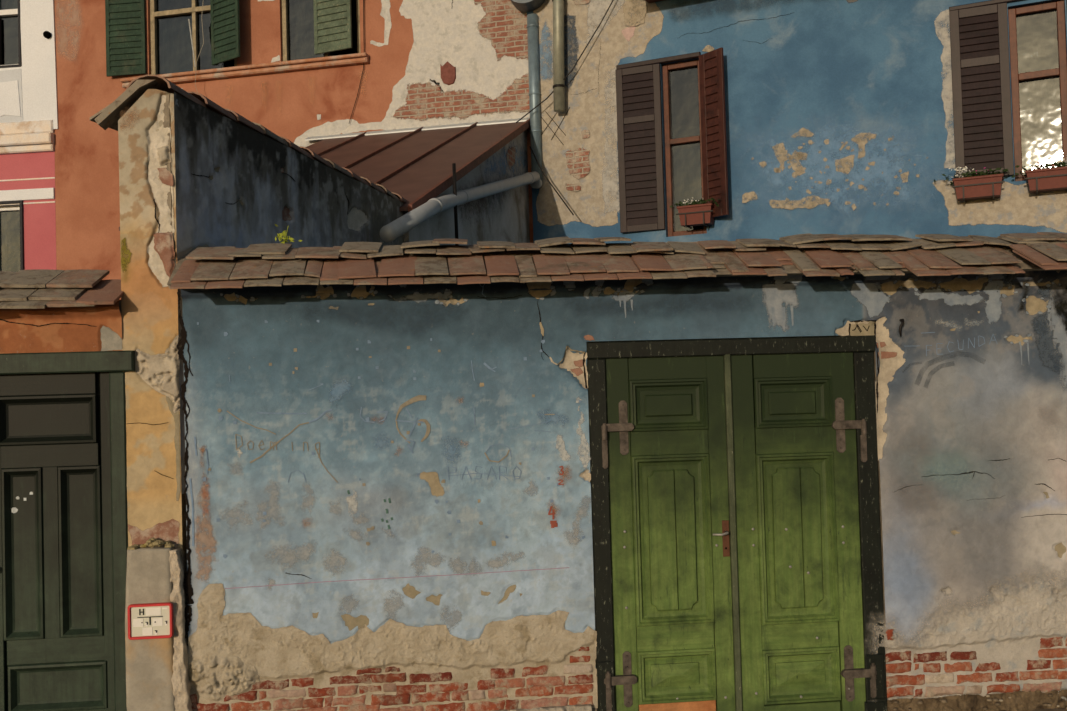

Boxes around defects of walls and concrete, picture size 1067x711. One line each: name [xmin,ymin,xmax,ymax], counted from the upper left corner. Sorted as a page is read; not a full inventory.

spalling [147,95,209,287]
peeling [294,0,664,227]
peeling [742,127,919,210]
peeling [933,9,1067,233]
crack [0,319,97,327]
spalling [558,335,595,389]
peeling [875,270,1066,379]
water stain [1047,286,1067,387]
crack [894,458,1010,501]
spalling [1055,542,1066,558]
spalling [128,519,598,711]
spalling [876,576,1067,711]